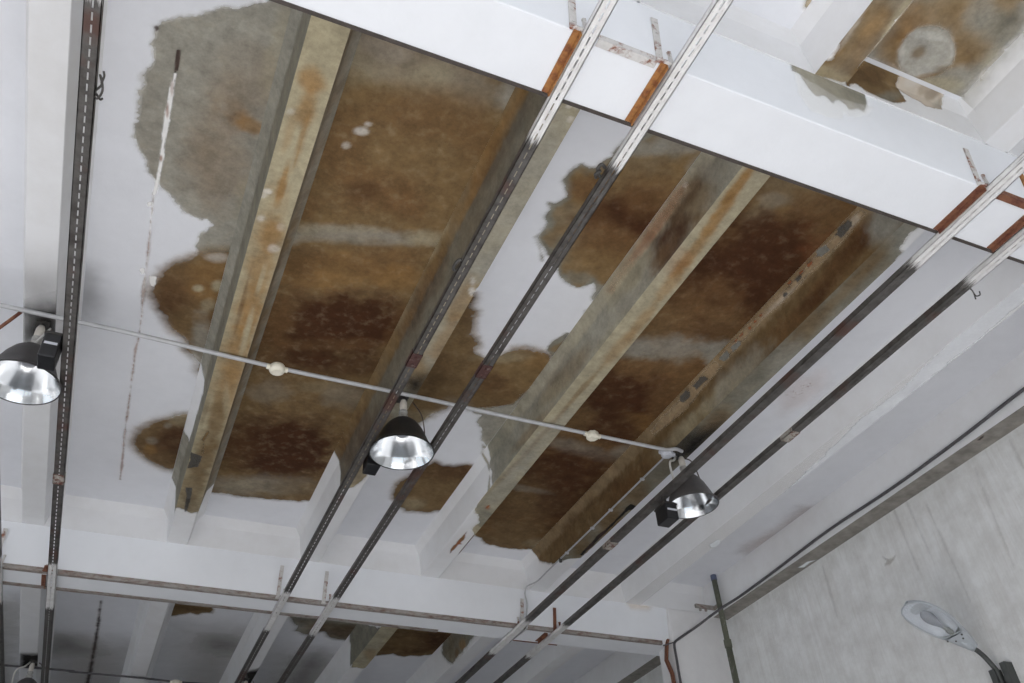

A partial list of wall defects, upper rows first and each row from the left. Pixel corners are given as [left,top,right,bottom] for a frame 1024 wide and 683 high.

crack [148,50,180,206]
leakage [792,0,1024,111]
peeling [897,76,943,109]
crack [140,246,156,306]
leakage [132,1,311,509]
corrosion [176,15,350,513]
leakage [199,29,918,564]